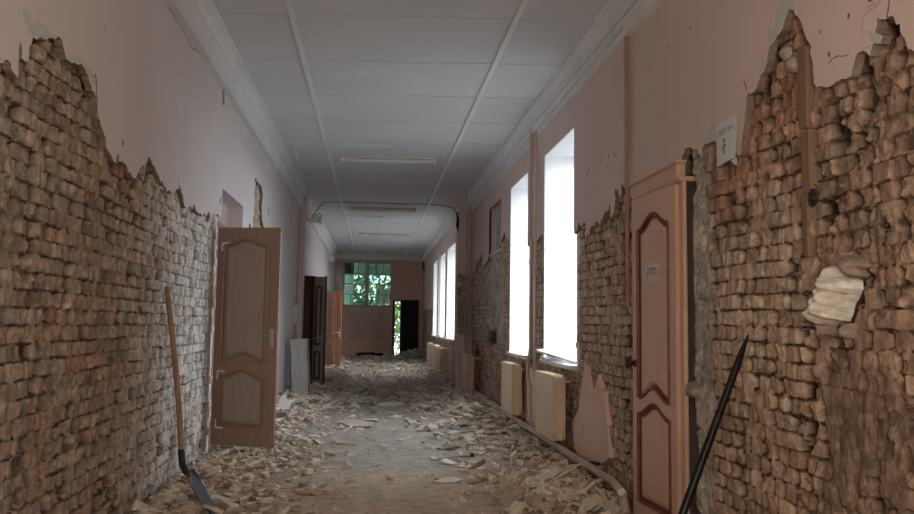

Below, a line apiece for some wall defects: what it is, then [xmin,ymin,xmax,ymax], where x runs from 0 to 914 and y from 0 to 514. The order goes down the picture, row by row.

crack [829,0,903,63]
flaking render [0,39,218,514]
flaking render [253,182,269,228]
flaking render [423,190,633,511]
flaking render [685,0,914,514]